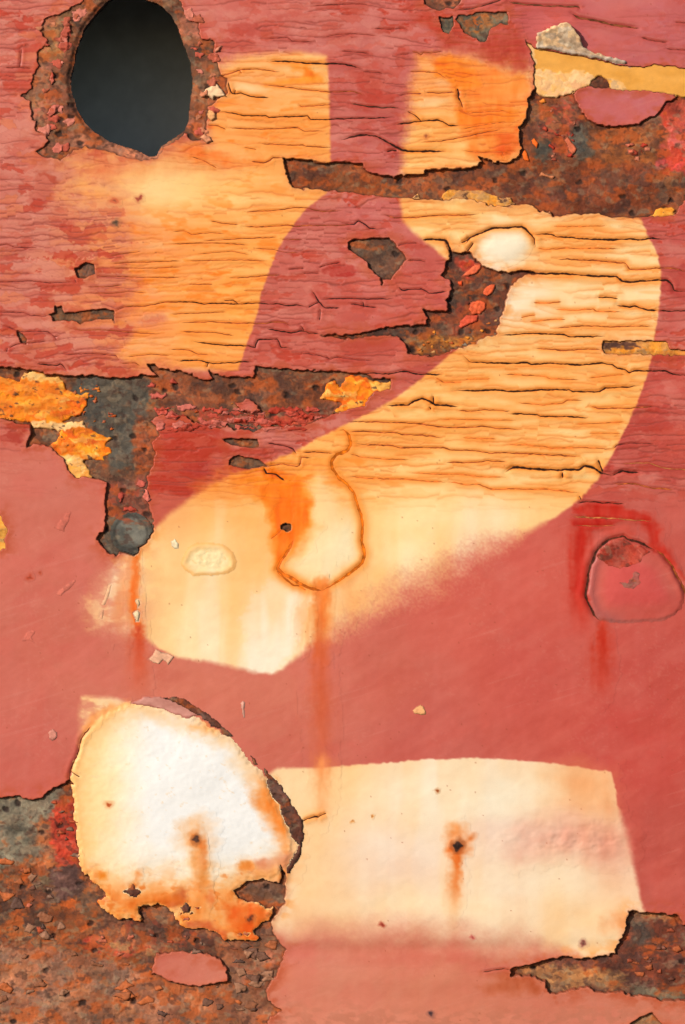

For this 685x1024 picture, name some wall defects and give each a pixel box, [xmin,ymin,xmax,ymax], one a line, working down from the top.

rust [21,0,685,229]
crack [210,27,505,163]
peeling [526,22,685,99]
crack [0,207,685,618]
rust [349,239,406,283]
rust [326,250,535,357]
rust [0,365,390,750]
rust [0,555,685,1024]